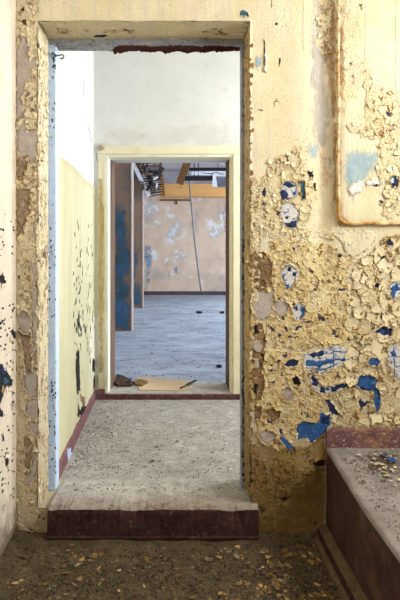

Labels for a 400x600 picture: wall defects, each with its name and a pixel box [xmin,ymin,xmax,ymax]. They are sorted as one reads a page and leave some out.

peeling [315,0,400,220]
flaking render [15,154,29,180]
flaking render [15,188,31,239]
peeling [16,250,37,333]
peeling [73,246,95,390]
flaking render [21,333,34,371]
peeling [0,360,15,417]
peeling [75,350,88,427]
flaking render [23,434,34,470]
peeling [36,509,48,533]